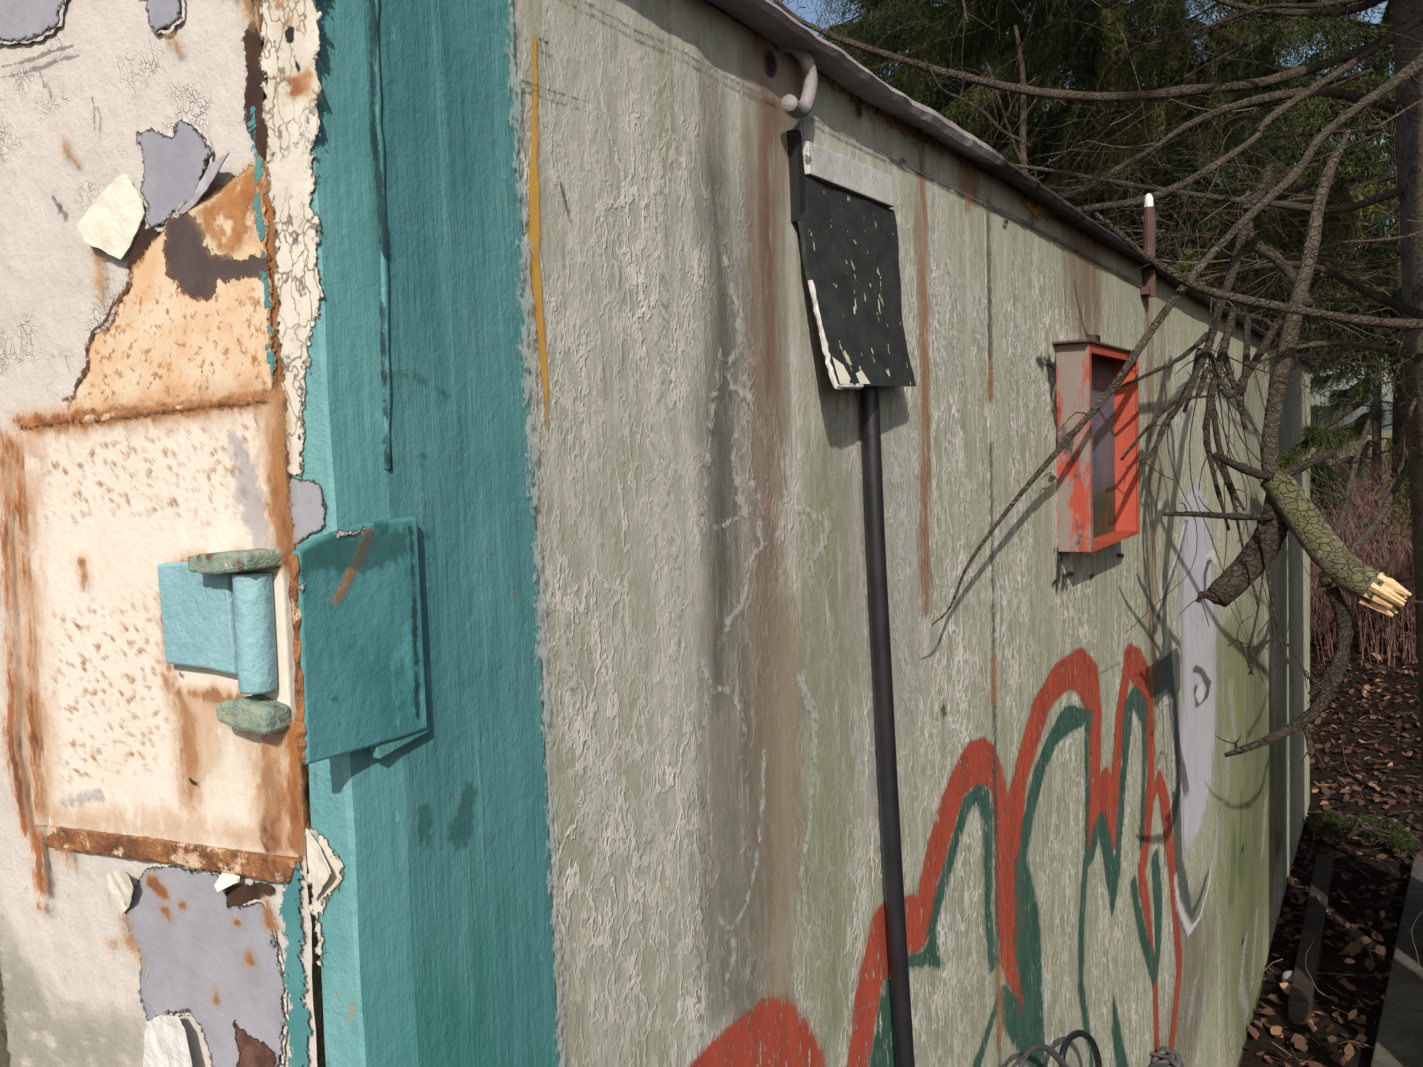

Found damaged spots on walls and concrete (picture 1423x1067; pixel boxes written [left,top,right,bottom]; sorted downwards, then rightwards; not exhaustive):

peeling [0,0,66,45]
peeling [145,0,185,34]
peeling [76,117,229,301]
corrosion [0,154,306,911]
peeling [258,0,326,548]
water stain [651,258,747,783]
water stain [700,256,763,632]
corrosion [920,251,930,613]
peeling [106,862,289,1067]
peeling [305,827,344,966]
water stain [719,605,819,1014]